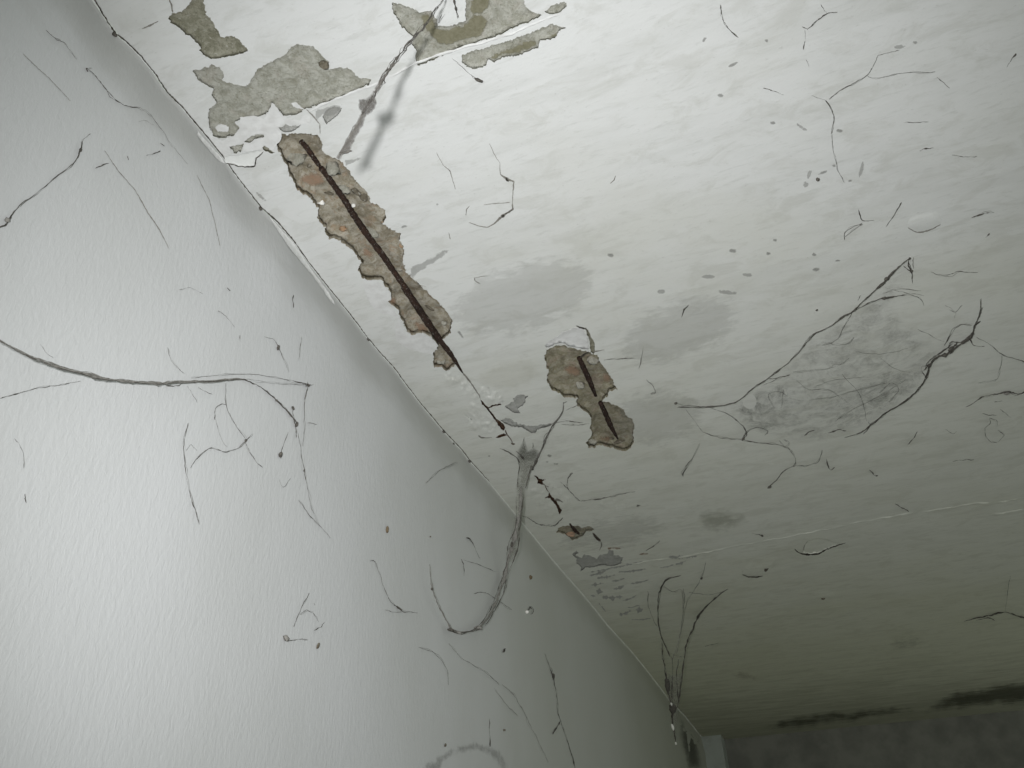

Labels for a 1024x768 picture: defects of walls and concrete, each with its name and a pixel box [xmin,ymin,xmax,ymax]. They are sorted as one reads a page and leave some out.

crack [94,0,515,481]
spalling [168,0,567,436]
spalling [544,328,634,451]
crack [535,476,562,514]
peeling [528,479,651,620]
leakage [945,686,1024,706]